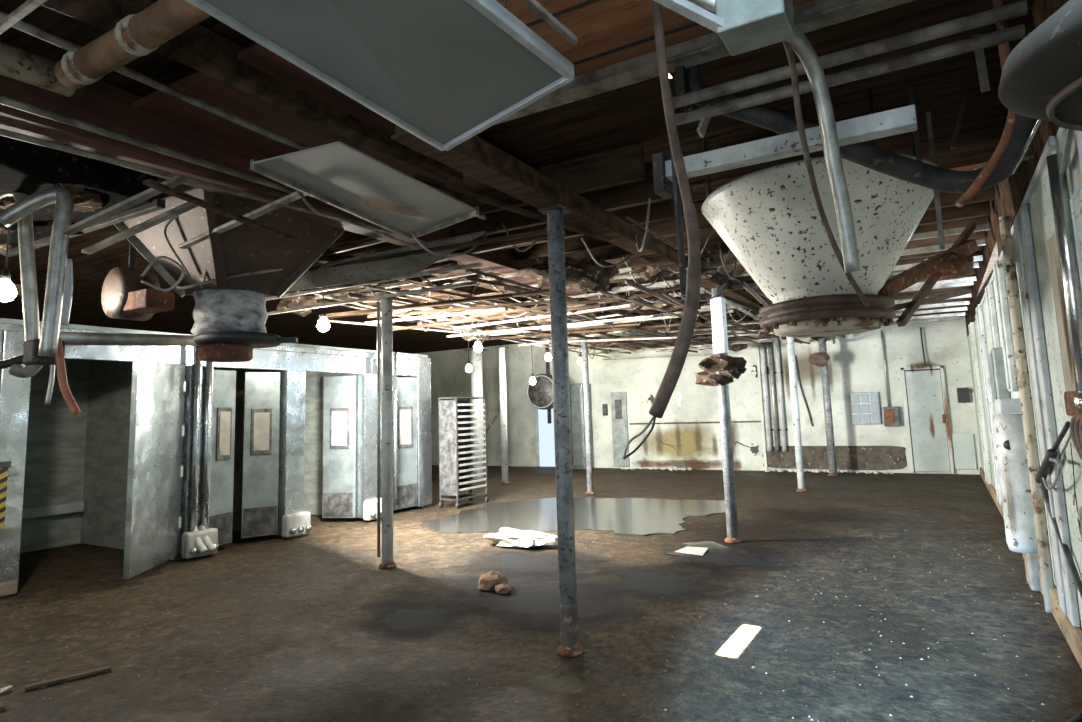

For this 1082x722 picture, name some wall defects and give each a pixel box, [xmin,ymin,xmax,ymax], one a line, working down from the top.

leakage [644,428,717,458]